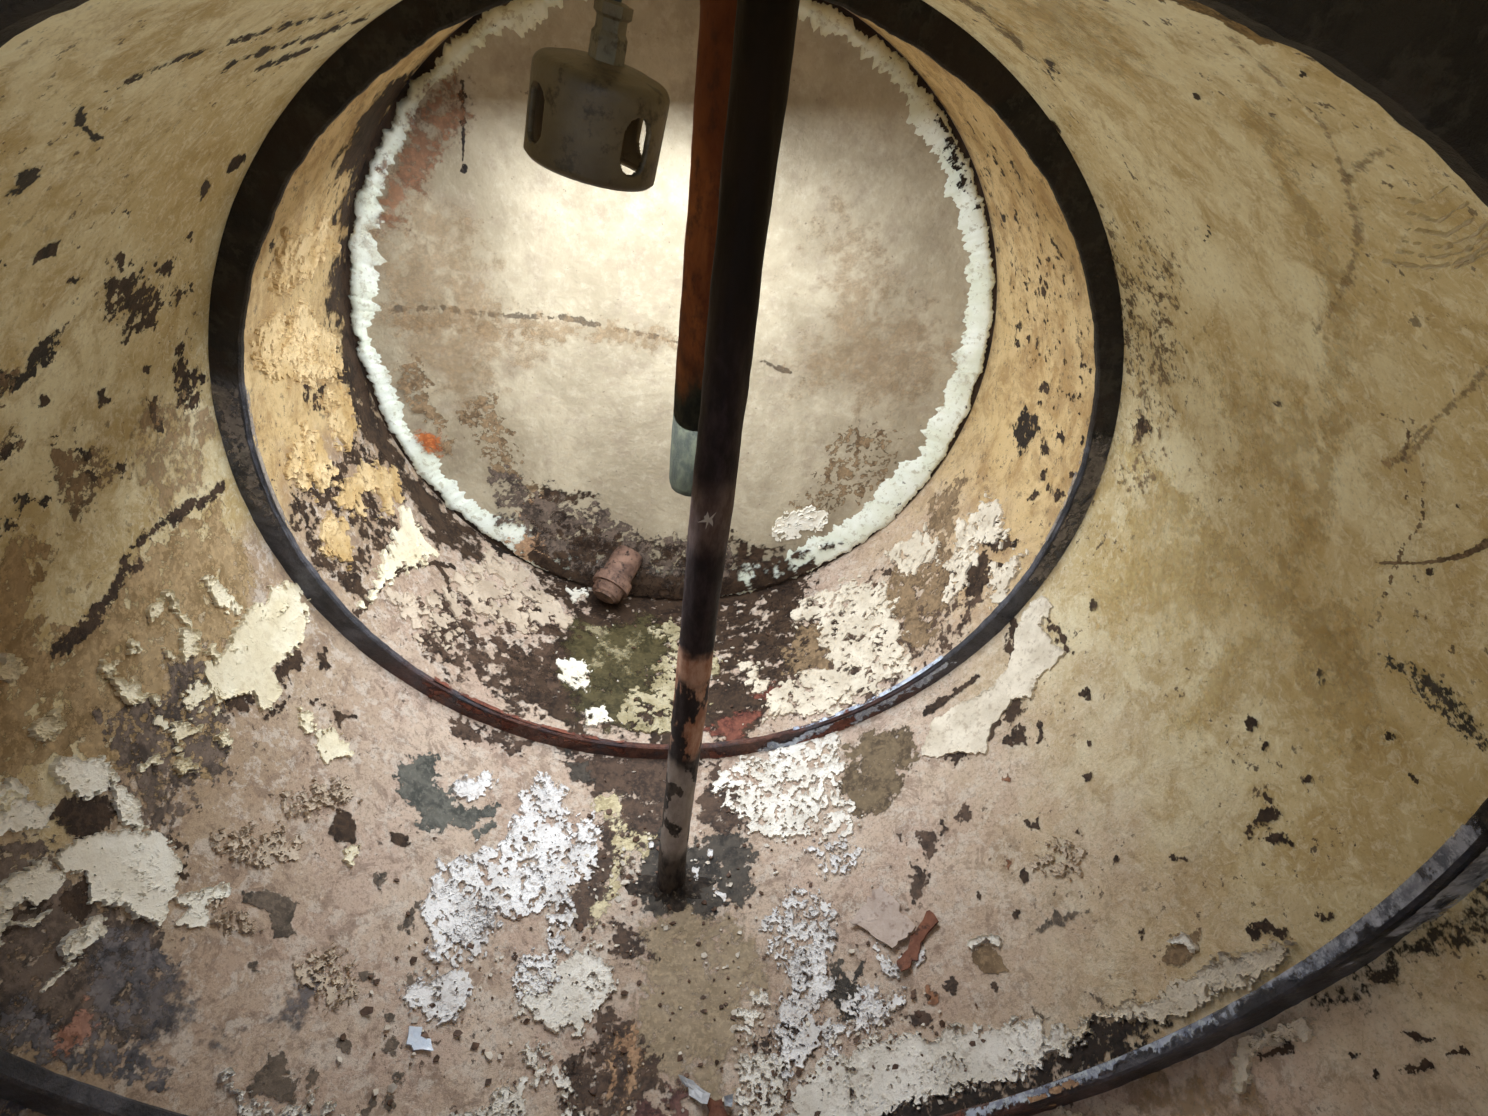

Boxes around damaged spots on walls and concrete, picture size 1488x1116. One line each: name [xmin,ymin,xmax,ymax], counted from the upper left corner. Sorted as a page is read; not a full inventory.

spalling [103,251,194,346]
leakage [290,65,1019,1116]
leakage [1046,617,1074,655]
corrosion [703,678,783,759]
corrosion [796,709,857,744]
leakage [997,699,1030,747]
peeling [0,575,311,993]
peeling [707,491,1298,1116]
peeling [396,770,619,1116]
corrosion [48,995,112,1058]
leakage [246,1046,320,1116]
corrosion [603,1022,690,1116]